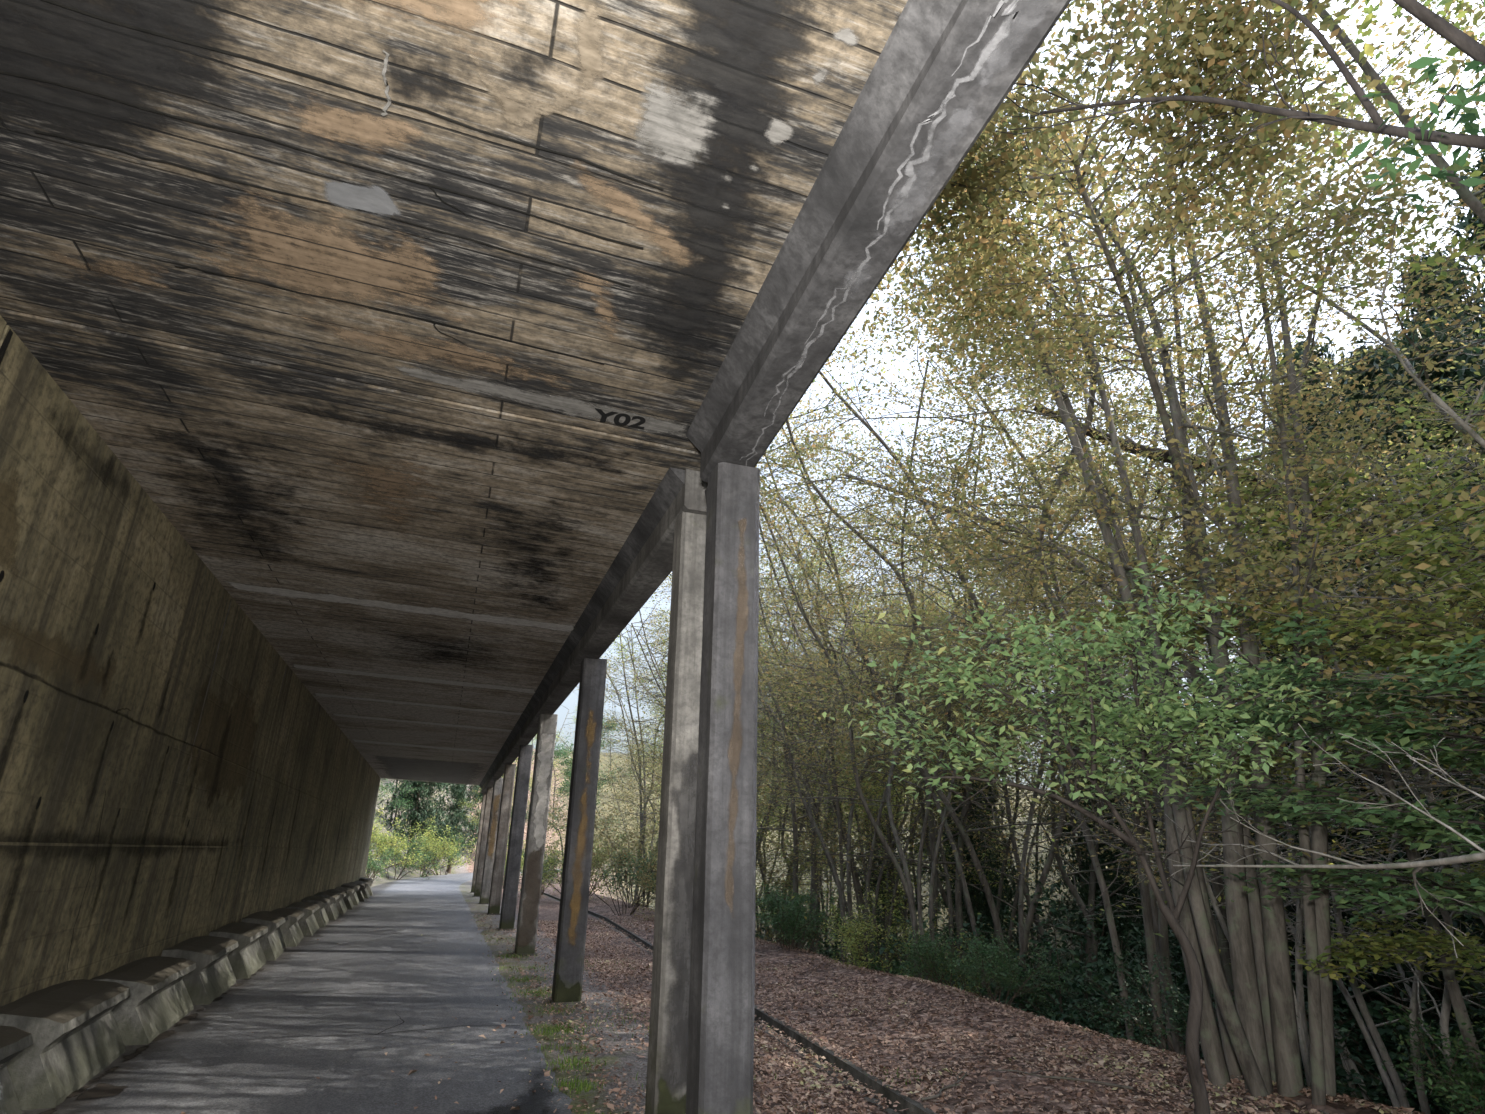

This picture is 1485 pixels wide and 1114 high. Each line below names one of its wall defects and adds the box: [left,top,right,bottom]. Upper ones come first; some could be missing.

peeling [197,198,569,389]
crack [740,0,1020,466]
rust [726,519,748,907]